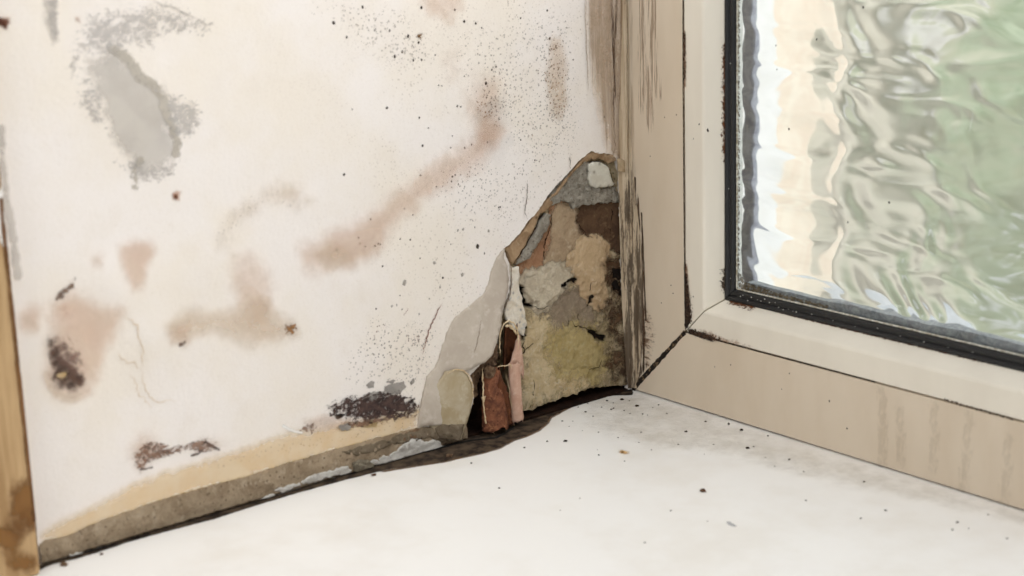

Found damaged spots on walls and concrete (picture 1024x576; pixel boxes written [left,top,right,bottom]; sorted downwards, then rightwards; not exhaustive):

peeling [91,45,182,190]
water stain [0,198,468,570]
spalling [417,151,628,441]
water stain [634,177,653,380]